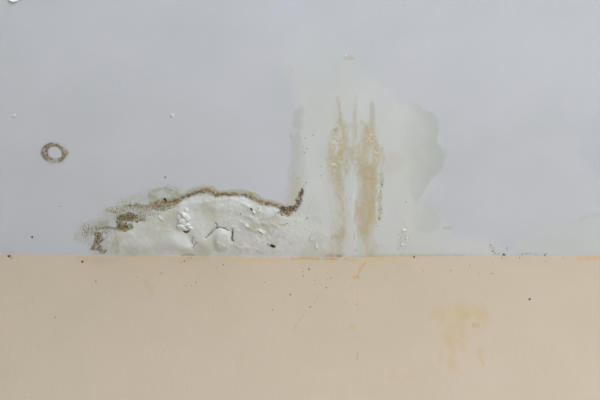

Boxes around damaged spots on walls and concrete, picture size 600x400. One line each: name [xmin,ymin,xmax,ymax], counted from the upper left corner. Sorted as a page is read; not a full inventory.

damp [38,140,70,166]
rust [220,94,430,290]
damp [70,22,600,257]